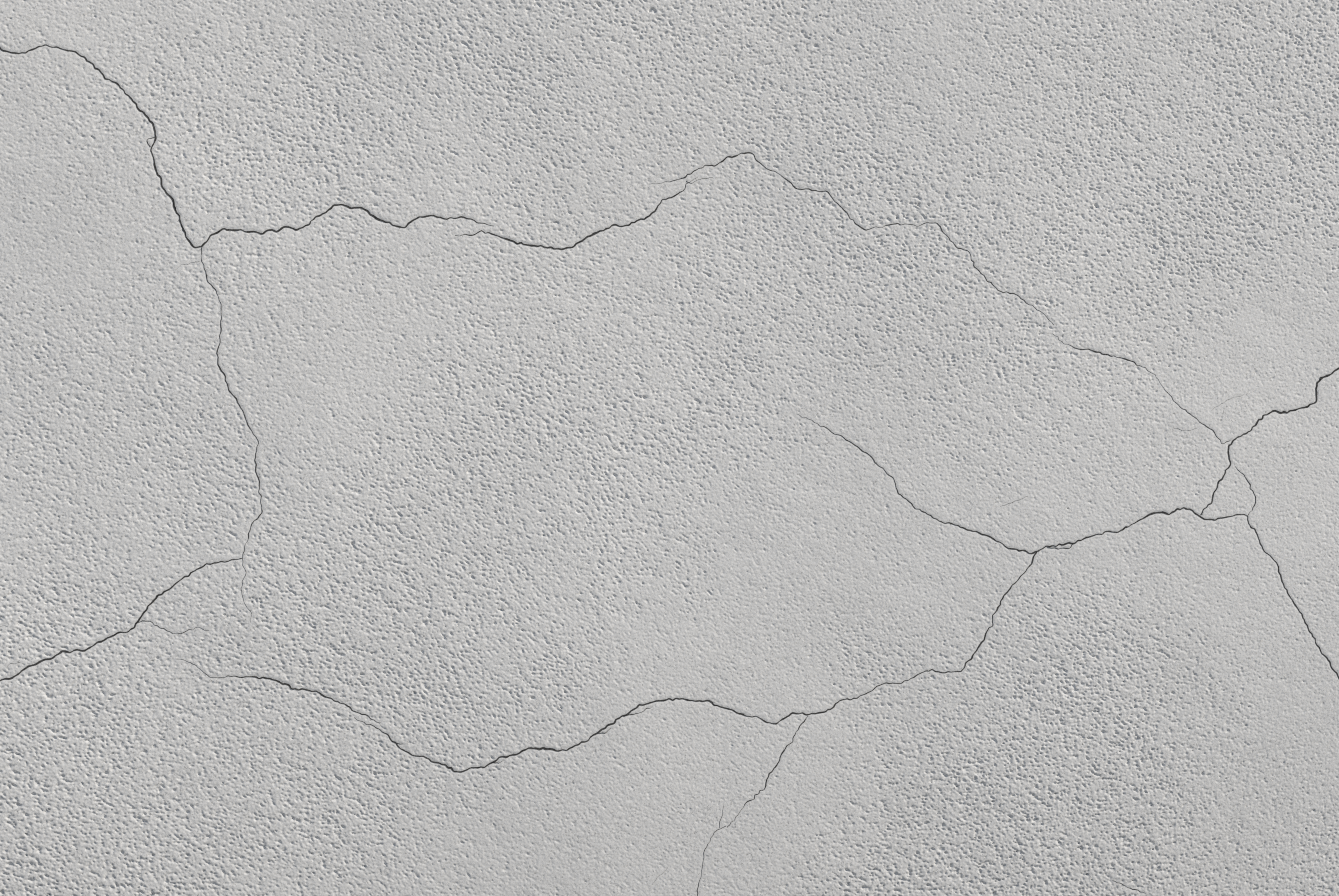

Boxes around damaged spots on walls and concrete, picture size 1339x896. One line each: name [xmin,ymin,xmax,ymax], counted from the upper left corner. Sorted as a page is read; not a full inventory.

crack [0,44,1063,681]
crack [182,346,1339,896]